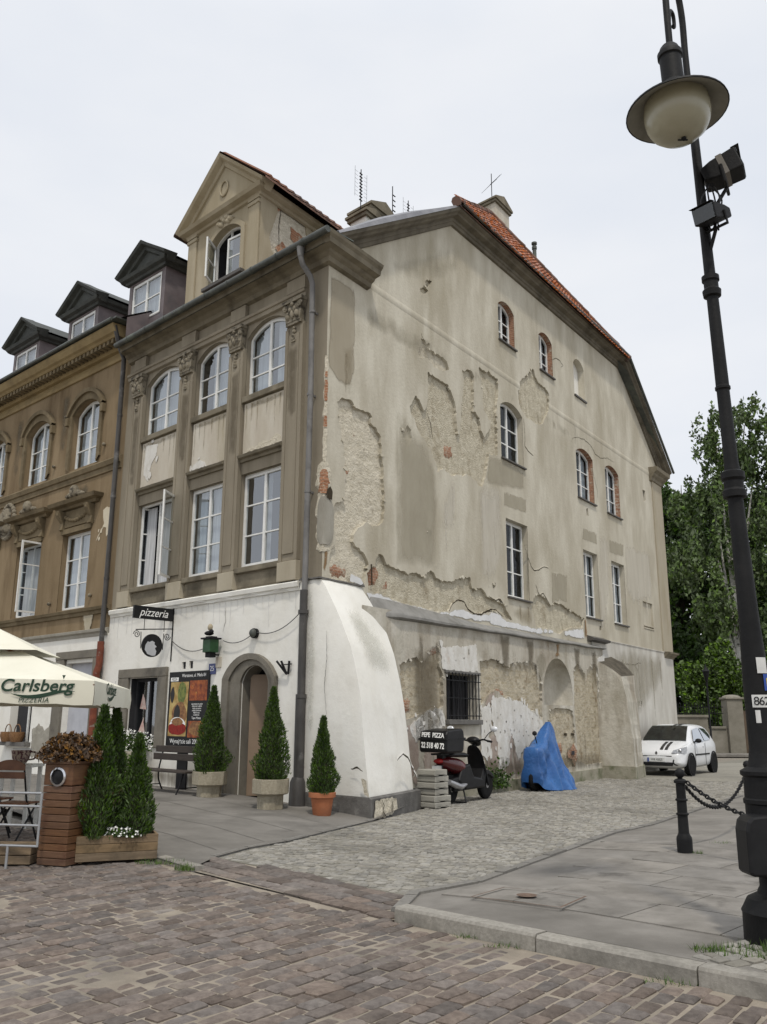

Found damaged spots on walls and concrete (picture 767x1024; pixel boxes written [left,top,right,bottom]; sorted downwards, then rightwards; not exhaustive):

flaking render [270,207,306,254]
flaking render [143,439,158,481]
flaking render [315,338,509,619]
flaking render [531,594,583,634]
peeling [399,640,605,786]